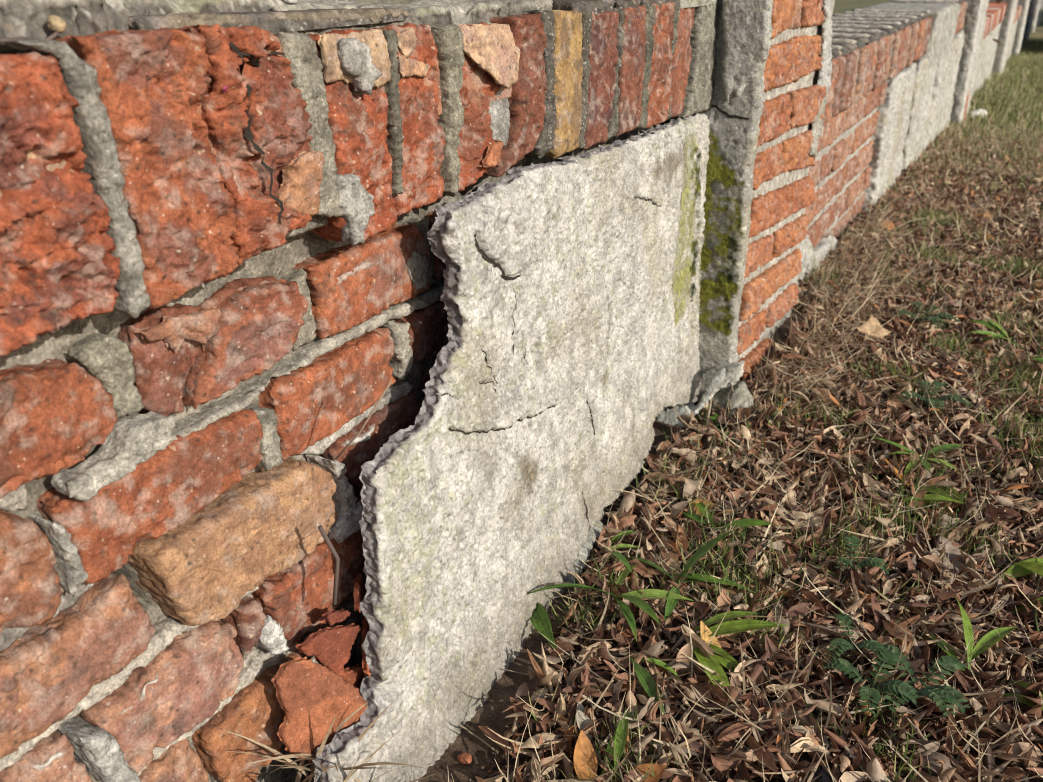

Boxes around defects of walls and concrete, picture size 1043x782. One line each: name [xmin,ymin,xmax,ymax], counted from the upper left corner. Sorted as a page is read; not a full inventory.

spalling [0,52,121,357]
crack [230,42,285,225]
peeling [53,0,839,782]
crack [479,348,498,392]
crack [474,234,528,364]
crack [449,388,595,436]